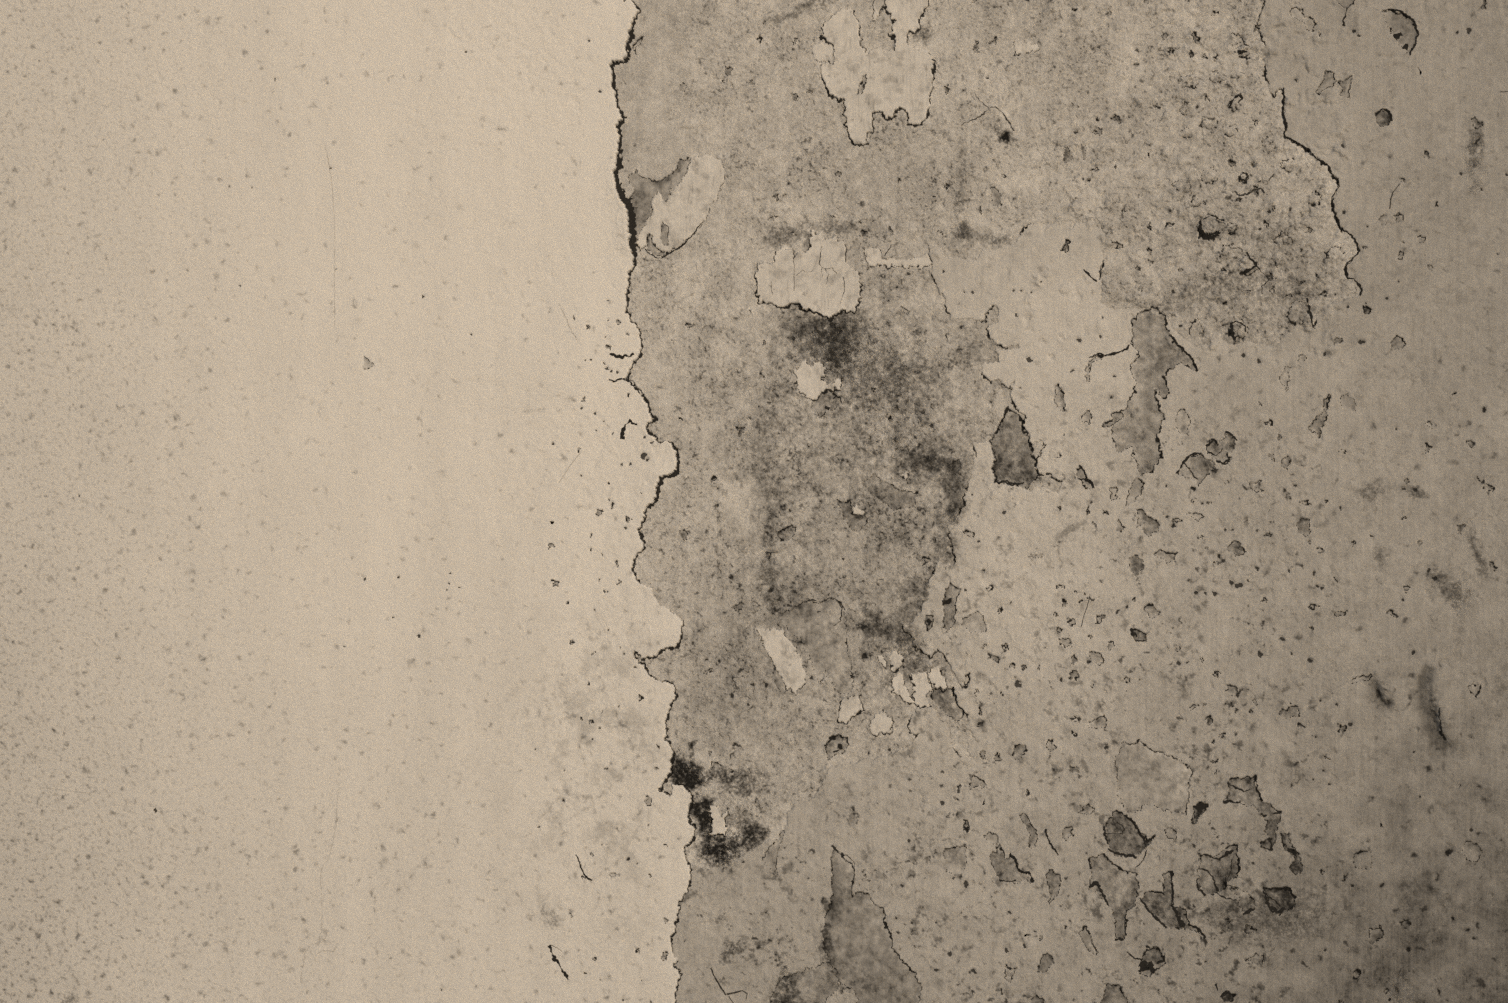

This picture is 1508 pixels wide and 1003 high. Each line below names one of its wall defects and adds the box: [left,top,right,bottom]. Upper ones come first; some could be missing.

peeling [1382,9,1419,55]
damp [795,317,858,366]
damp [900,449,956,480]
spalling [573,0,1406,877]
damp [863,613,919,667]
damp [671,741,767,871]
peeling [943,789,1062,904]
peeling [1070,704,1325,934]
spalling [769,847,952,1003]
peeling [1000,930,1054,995]
peeling [1088,853,1206,977]
peeling [1215,983,1250,1003]